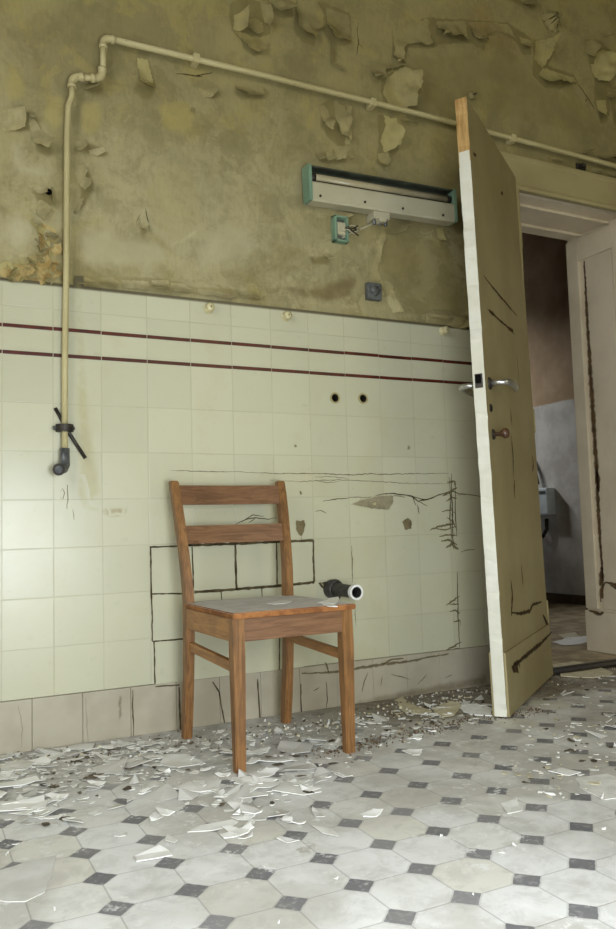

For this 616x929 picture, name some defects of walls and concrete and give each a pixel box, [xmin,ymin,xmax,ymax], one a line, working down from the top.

peeling [227,0,353,71]
peeling [79,80,106,98]
peeling [131,56,159,103]
peeling [2,106,58,160]
peeling [314,96,354,167]
peeling [73,139,111,223]
peeling [0,184,63,286]
peeling [73,274,268,304]
peeling [372,219,469,328]
spalling [348,494,394,511]
crack [150,514,315,728]
crack [172,470,481,712]